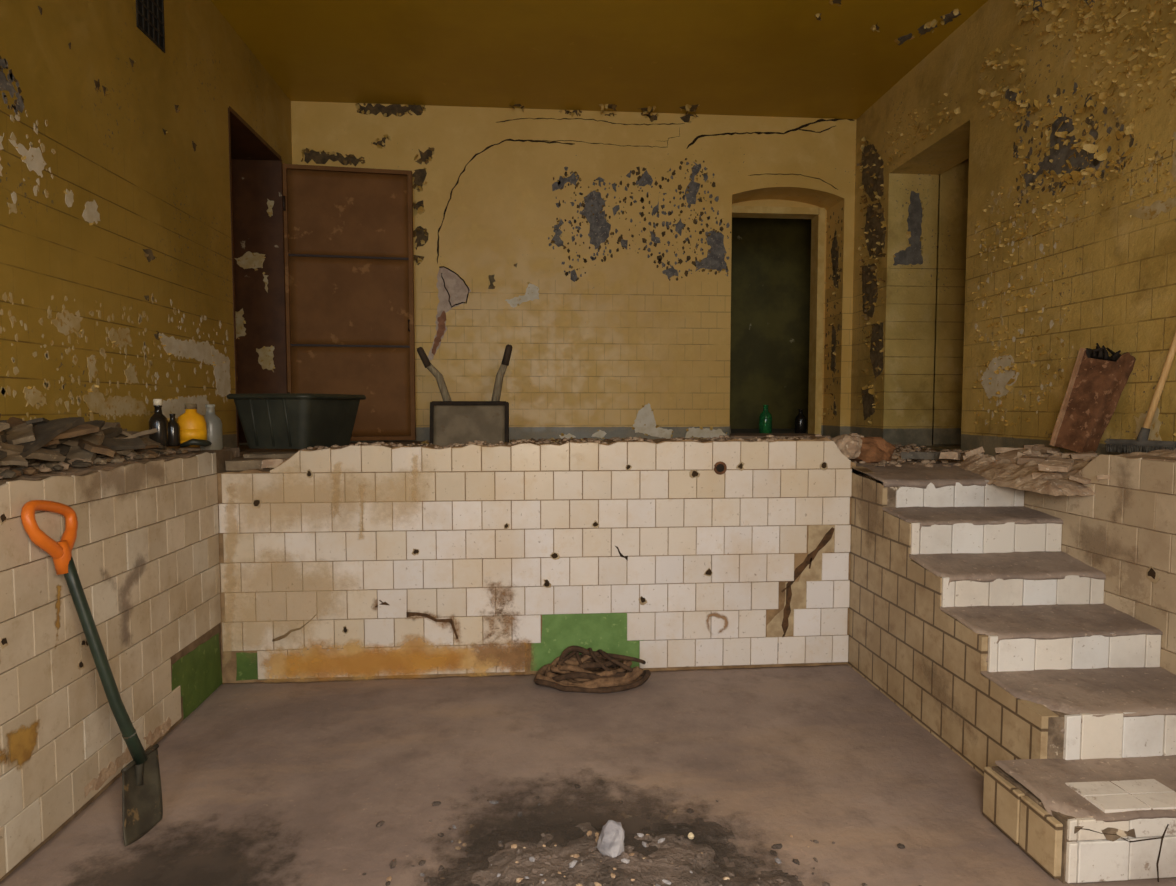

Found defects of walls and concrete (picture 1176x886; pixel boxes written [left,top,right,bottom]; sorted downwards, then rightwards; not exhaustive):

peeling [0,56,56,198]
peeling [0,292,246,421]
peeling [235,251,269,293]
peeling [301,148,365,166]
peeling [355,103,426,117]
spalling [428,266,471,361]
peeling [548,158,731,282]
crack [437,118,854,264]
peeling [857,93,961,424]
peeling [971,0,1176,426]
spalling [0,403,856,882]
crack [781,527,835,637]